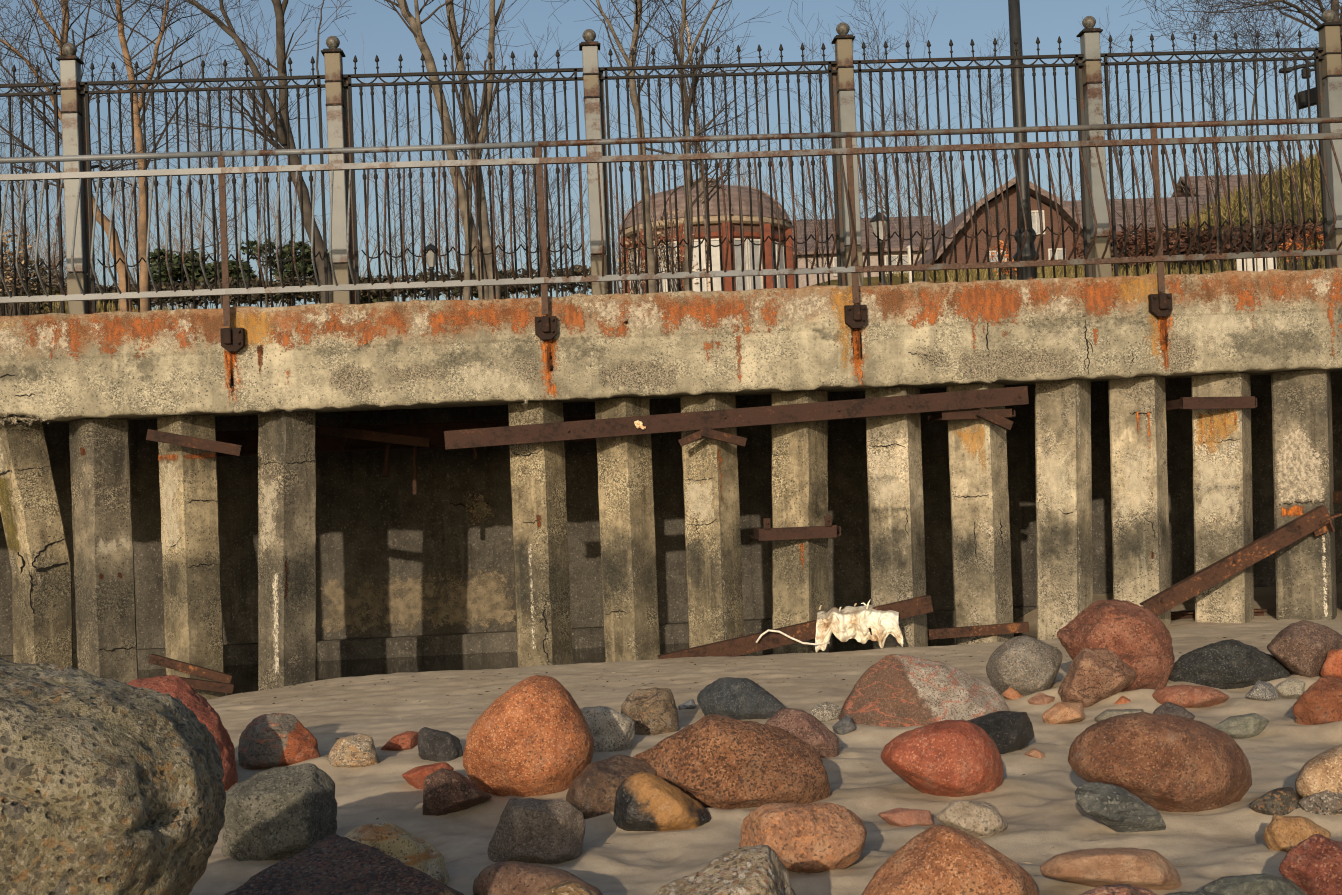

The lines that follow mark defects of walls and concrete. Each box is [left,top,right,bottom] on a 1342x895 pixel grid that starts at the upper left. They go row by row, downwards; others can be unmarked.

corrosion [0,313,208,346]
corrosion [224,297,577,400]
corrosion [602,291,780,322]
corrosion [831,267,1342,382]